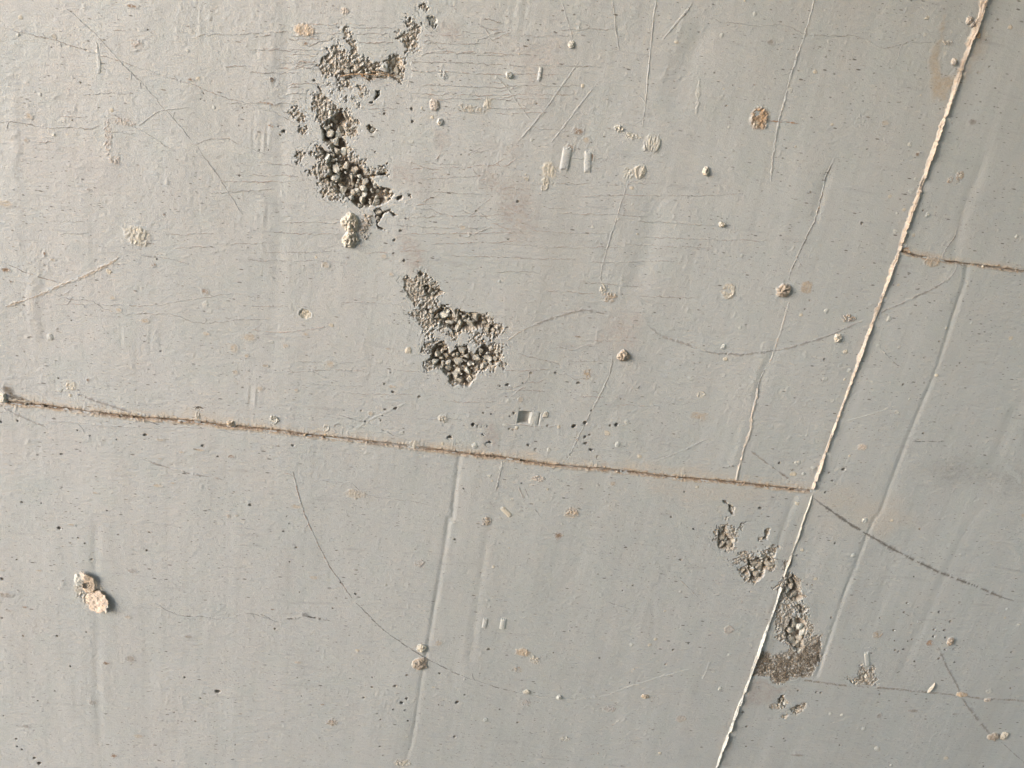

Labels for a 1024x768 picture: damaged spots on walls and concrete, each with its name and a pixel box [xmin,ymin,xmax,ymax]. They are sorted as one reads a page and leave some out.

crack [1,9,393,210]
crack [367,0,620,132]
crack [634,1,656,127]
crack [714,0,932,182]
crack [1,262,328,333]
crack [142,221,340,264]
crack [364,147,765,299]
crack [757,158,834,388]
crack [288,327,619,459]
crack [285,472,520,694]